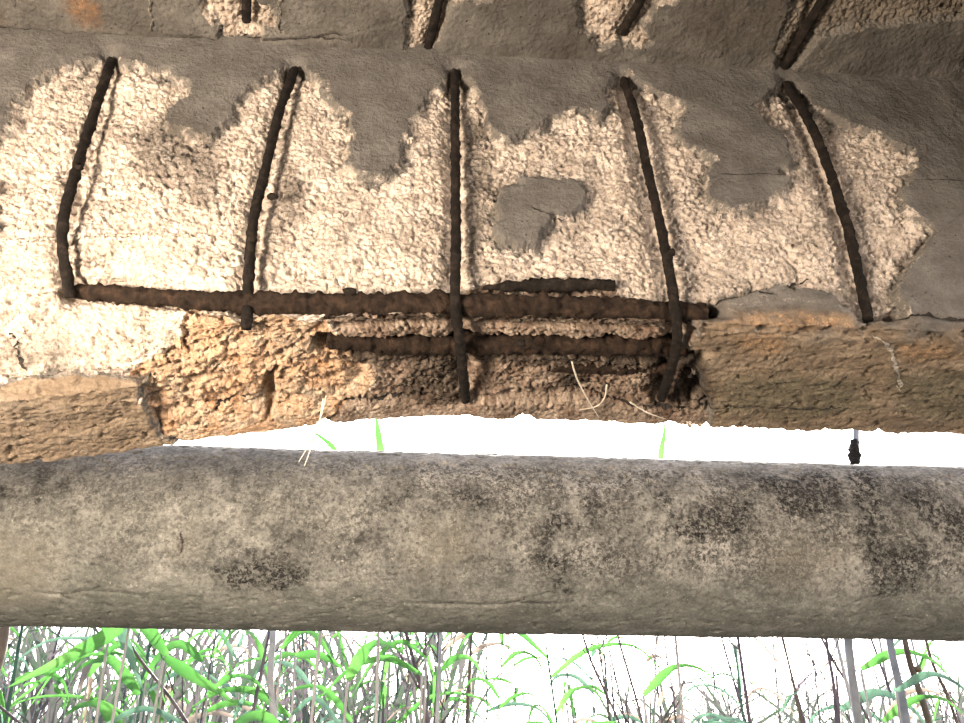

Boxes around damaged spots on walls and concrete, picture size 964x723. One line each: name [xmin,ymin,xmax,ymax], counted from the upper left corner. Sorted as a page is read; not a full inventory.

spalling [198,0,285,43]
spalling [403,0,493,49]
spalling [576,0,681,52]
spalling [772,0,964,70]
spalling [0,57,938,444]
corrosion [730,311,851,354]
crack [529,376,847,411]